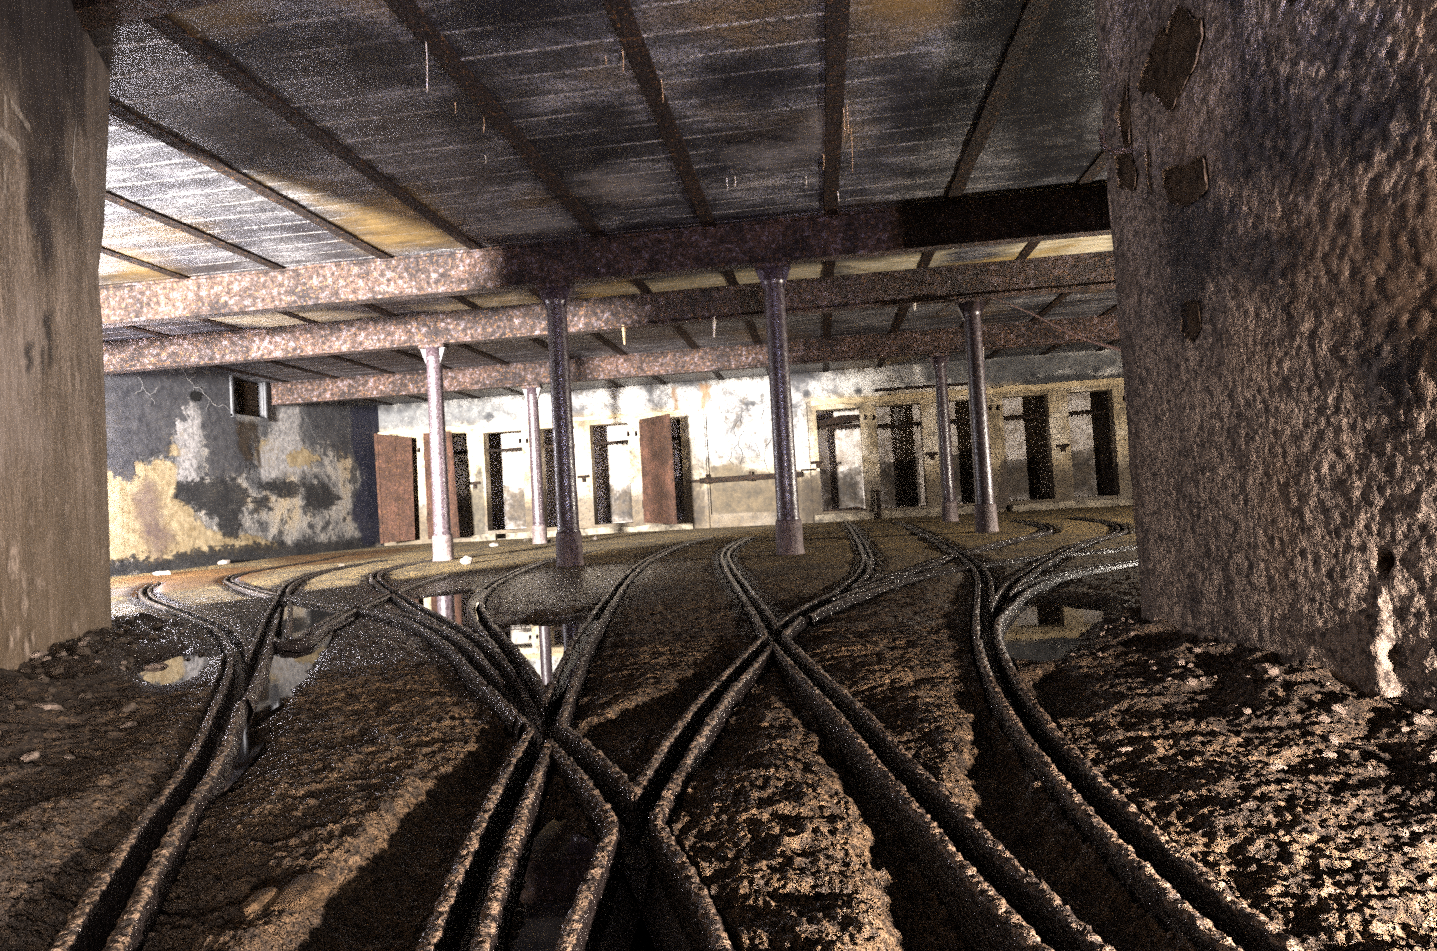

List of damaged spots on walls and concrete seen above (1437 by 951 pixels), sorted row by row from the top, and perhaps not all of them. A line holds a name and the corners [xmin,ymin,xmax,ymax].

damp [0,0,85,266]
spalling [1114,4,1210,208]
corrosion [117,252,161,277]
corrosion [975,245,1074,263]
damp [26,315,52,369]
spalling [1180,300,1202,342]
flaking render [254,434,321,469]
flaking render [107,431,278,565]